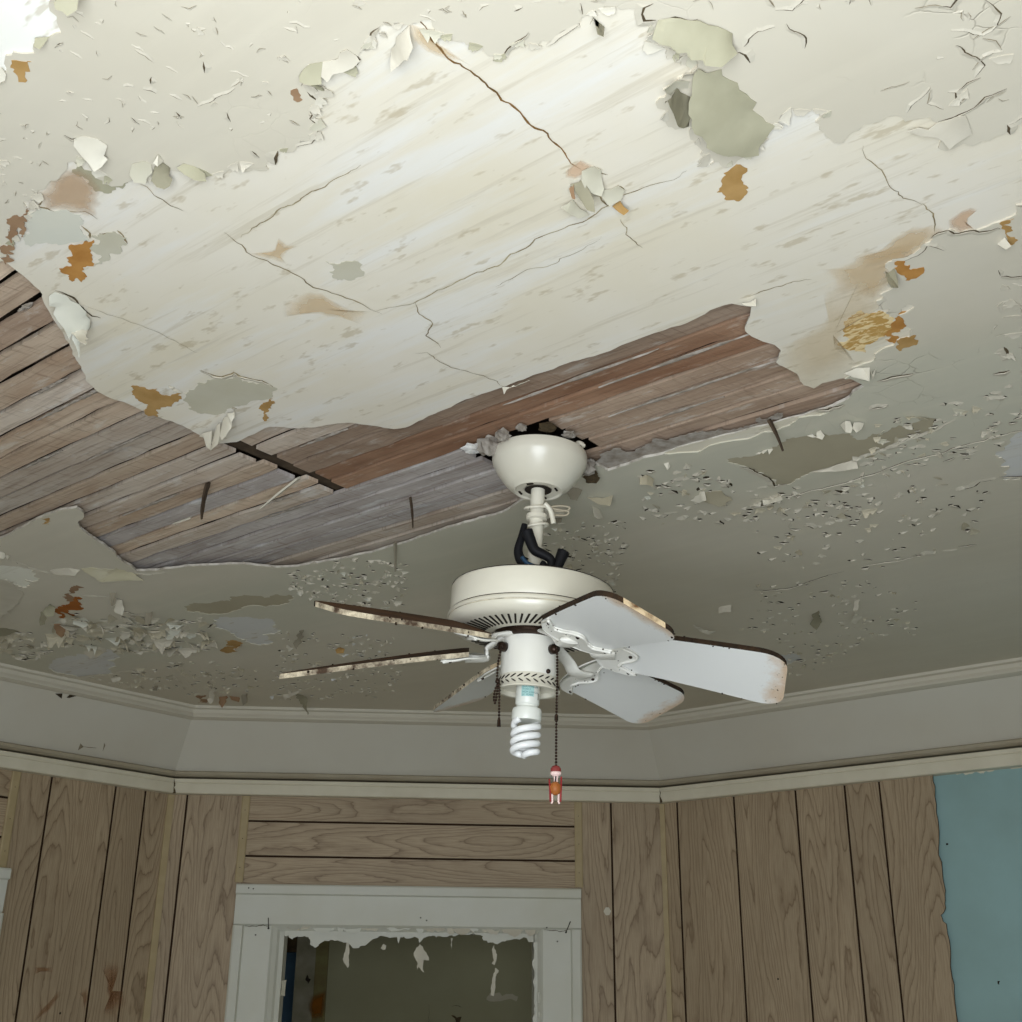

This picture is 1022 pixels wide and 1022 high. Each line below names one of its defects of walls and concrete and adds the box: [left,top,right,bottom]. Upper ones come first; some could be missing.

crack [504,3,583,58]
crack [635,0,698,26]
crack [735,0,807,63]
crack [906,0,1007,123]
crack [227,22,683,385]
flaking render [0,0,1022,451]
crack [863,152,1000,261]
peeling [595,384,1022,570]
peeling [542,487,630,593]
flaking render [0,558,409,682]
flaking render [196,691,248,708]
peeling [284,927,540,1022]